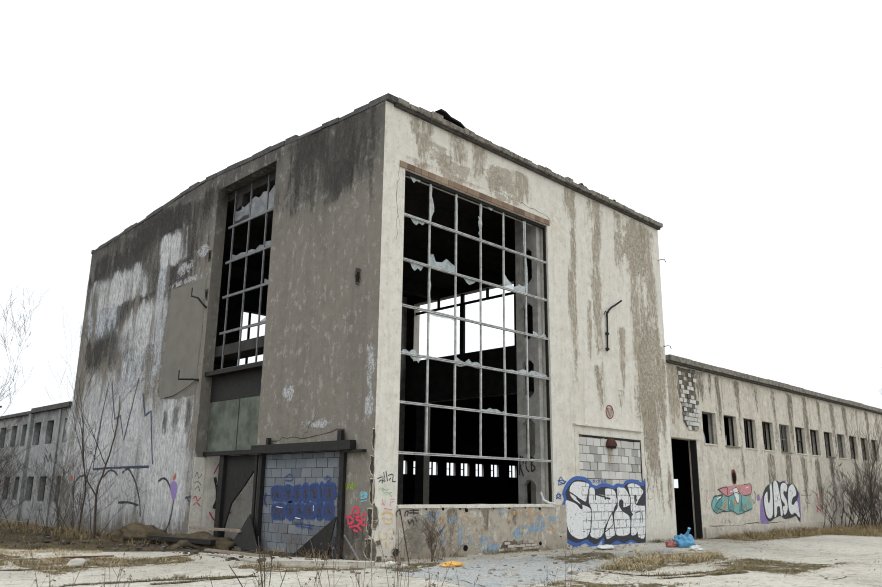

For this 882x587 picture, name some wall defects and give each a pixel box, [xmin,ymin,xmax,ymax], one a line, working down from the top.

water stain [278,106,379,214]
water stain [411,116,432,157]
water stain [443,135,501,190]
water stain [515,171,528,201]
water stain [85,189,224,372]
water stain [565,189,603,403]
water stain [162,399,191,431]
peeling [365,342,375,417]
water stain [695,372,722,429]
water stain [768,395,879,511]
spalling [363,428,398,562]